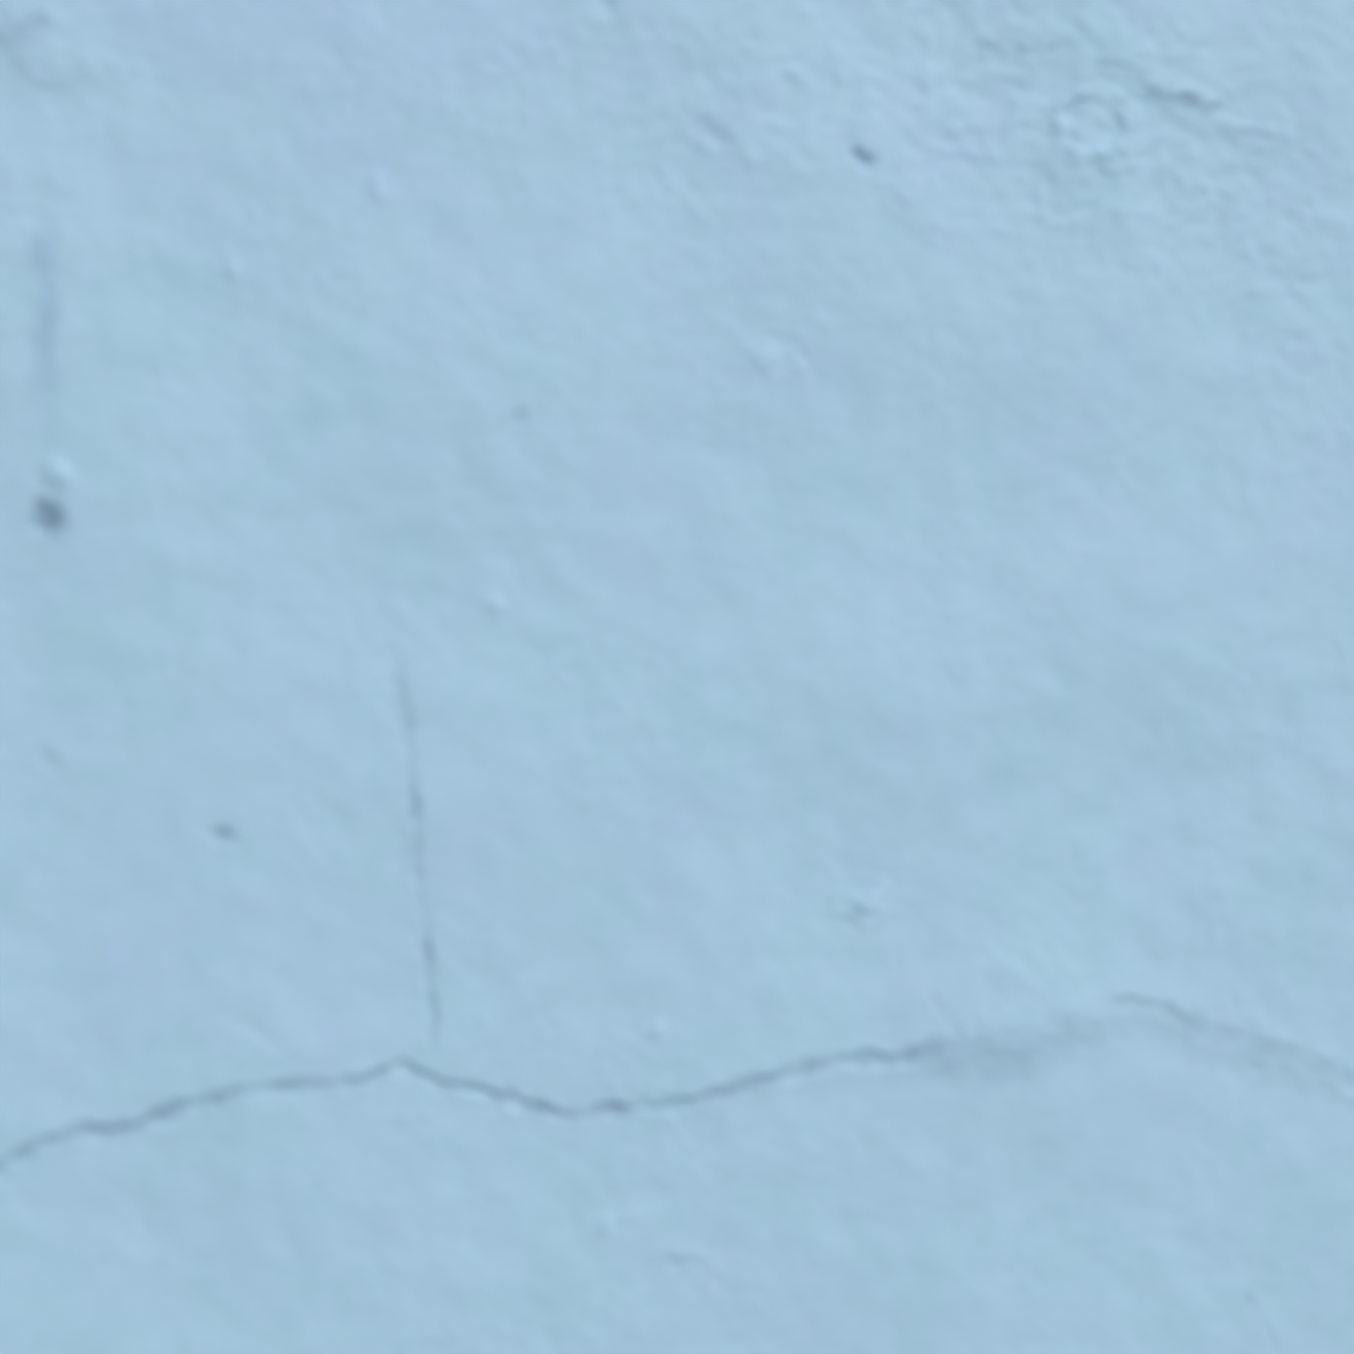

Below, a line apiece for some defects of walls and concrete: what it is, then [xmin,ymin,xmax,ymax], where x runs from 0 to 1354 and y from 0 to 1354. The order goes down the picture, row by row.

crack [0,978,1354,1237]